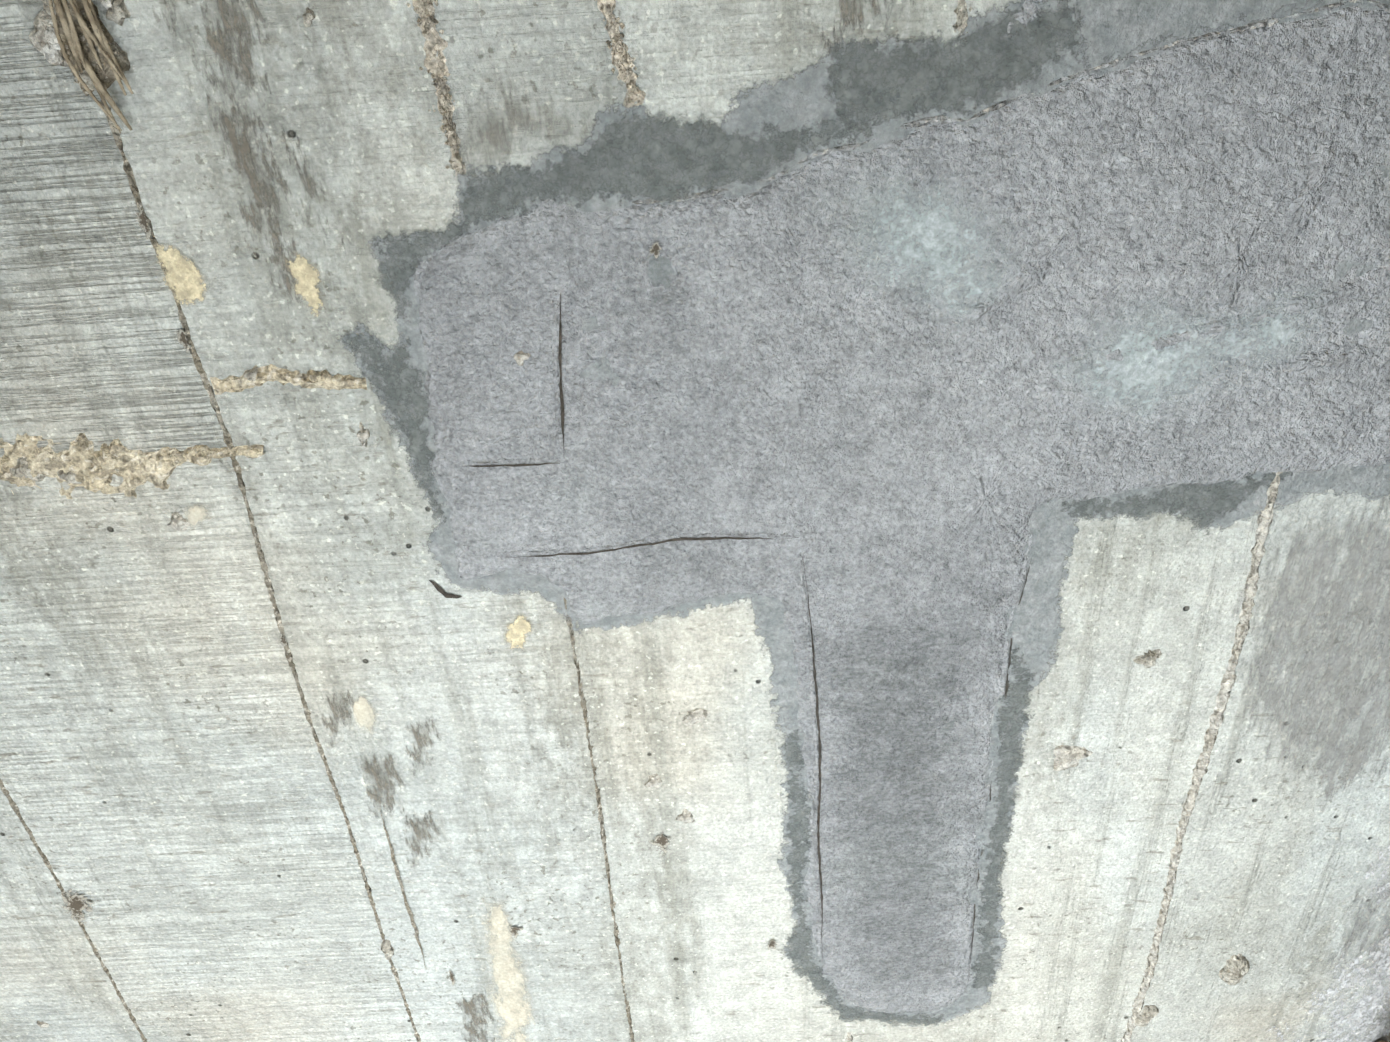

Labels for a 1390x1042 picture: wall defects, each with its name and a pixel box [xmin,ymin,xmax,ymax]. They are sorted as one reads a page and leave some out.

crack [470,293,564,467]
crack [511,537,823,957]